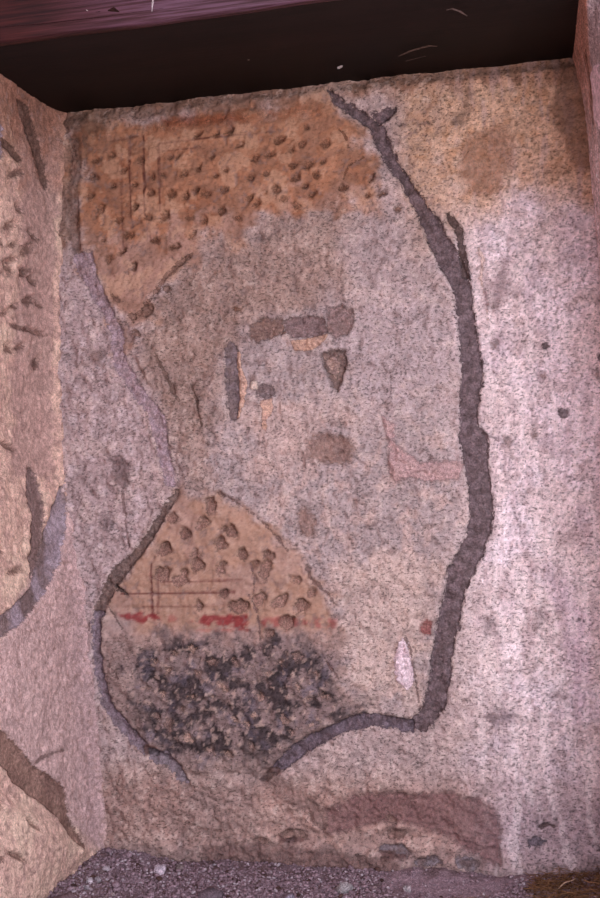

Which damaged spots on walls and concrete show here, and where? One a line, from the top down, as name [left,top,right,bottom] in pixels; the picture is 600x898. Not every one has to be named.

flaking render [289,161,324,198]
flaking render [0,223,42,315]
spalling [249,305,354,391]
crack [0,99,202,784]
crack [273,89,495,770]
flaking render [157,541,172,556]
flaking render [152,549,205,588]
flaking render [168,497,217,539]
flaking render [214,524,238,550]
crack [217,491,289,551]
flaking render [220,549,316,638]
crack [0,731,85,849]